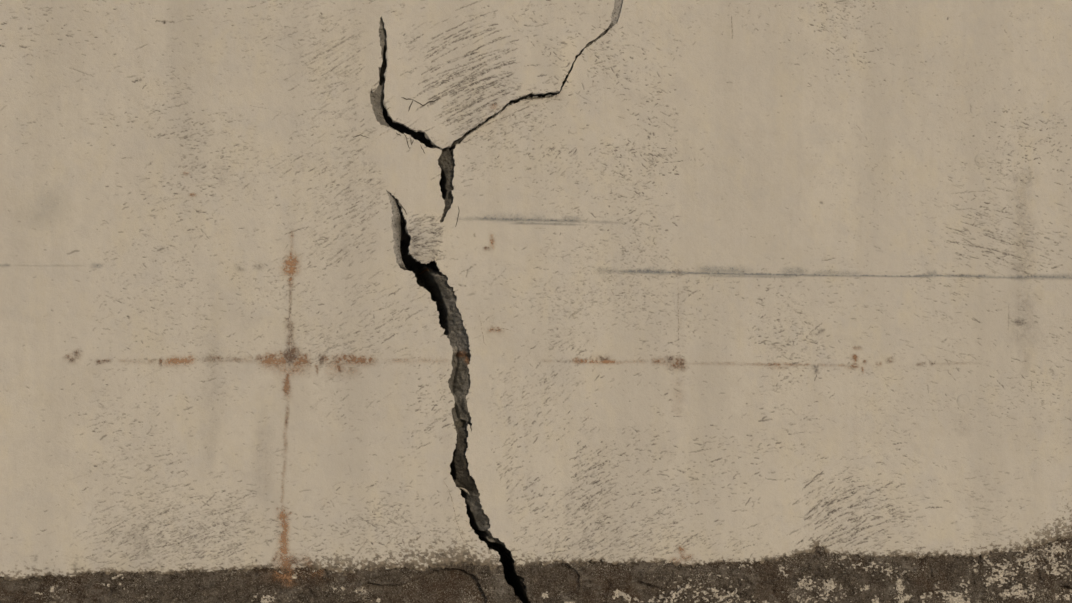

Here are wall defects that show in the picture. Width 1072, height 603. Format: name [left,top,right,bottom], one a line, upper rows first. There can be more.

crack [353,0,623,227]
corrosion [284,253,298,293]
corrosion [260,324,372,394]
crack [386,190,531,603]
corrosion [273,510,296,582]